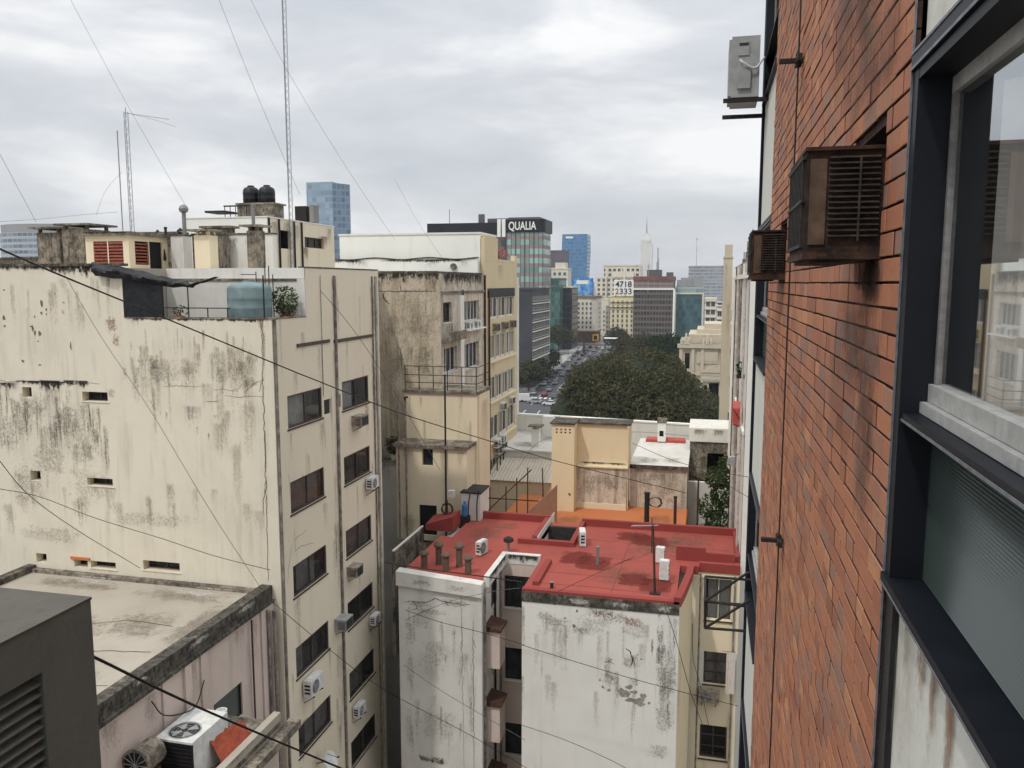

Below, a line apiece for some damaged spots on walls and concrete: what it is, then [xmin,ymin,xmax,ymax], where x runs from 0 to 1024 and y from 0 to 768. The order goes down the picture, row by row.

leakage [378,259,481,286]
leakage [0,380,87,390]
crack [408,578,476,758]
peeling [598,673,650,707]